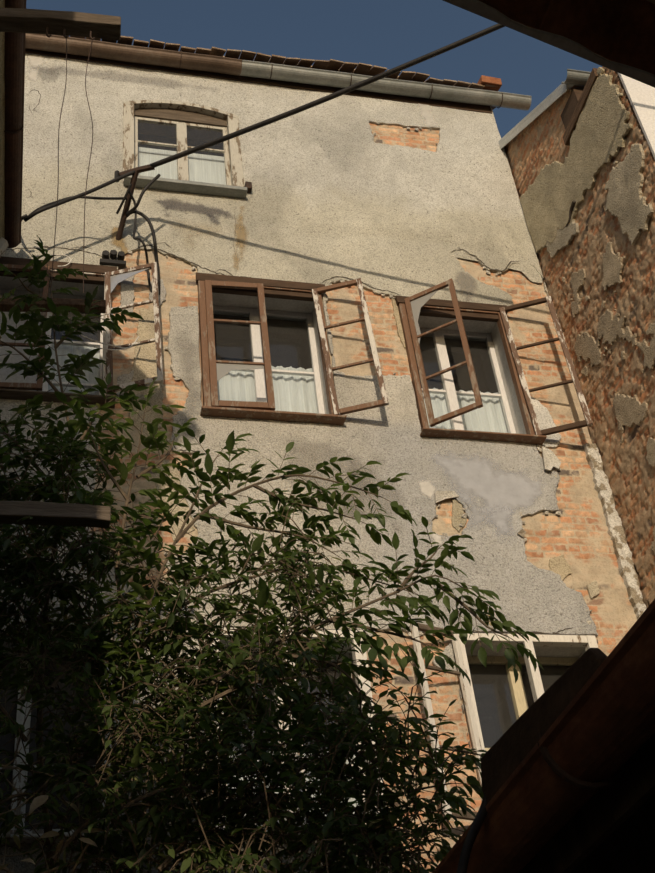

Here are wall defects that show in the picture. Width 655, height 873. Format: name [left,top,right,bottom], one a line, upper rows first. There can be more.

spalling [369,120,439,152]
peeling [520,67,654,258]
crack [453,247,518,274]
spalling [322,280,412,381]
spalling [90,246,202,588]
spalling [452,253,647,656]
spalling [428,491,469,539]